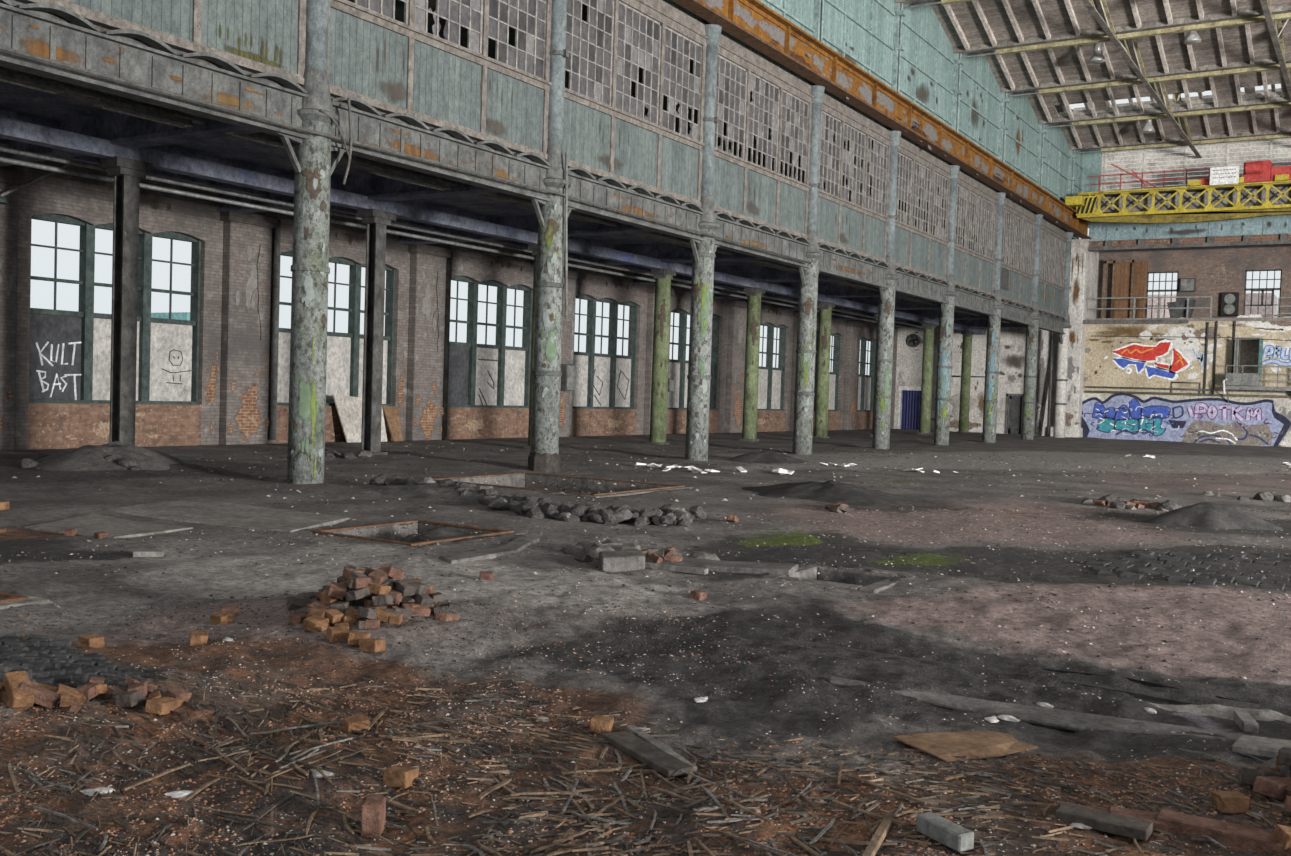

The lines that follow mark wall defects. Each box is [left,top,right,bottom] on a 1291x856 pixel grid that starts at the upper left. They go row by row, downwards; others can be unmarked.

peeling [302,160,329,240]
peeling [301,271,327,307]
flaking render [205,353,269,444]
peeling [291,362,341,458]